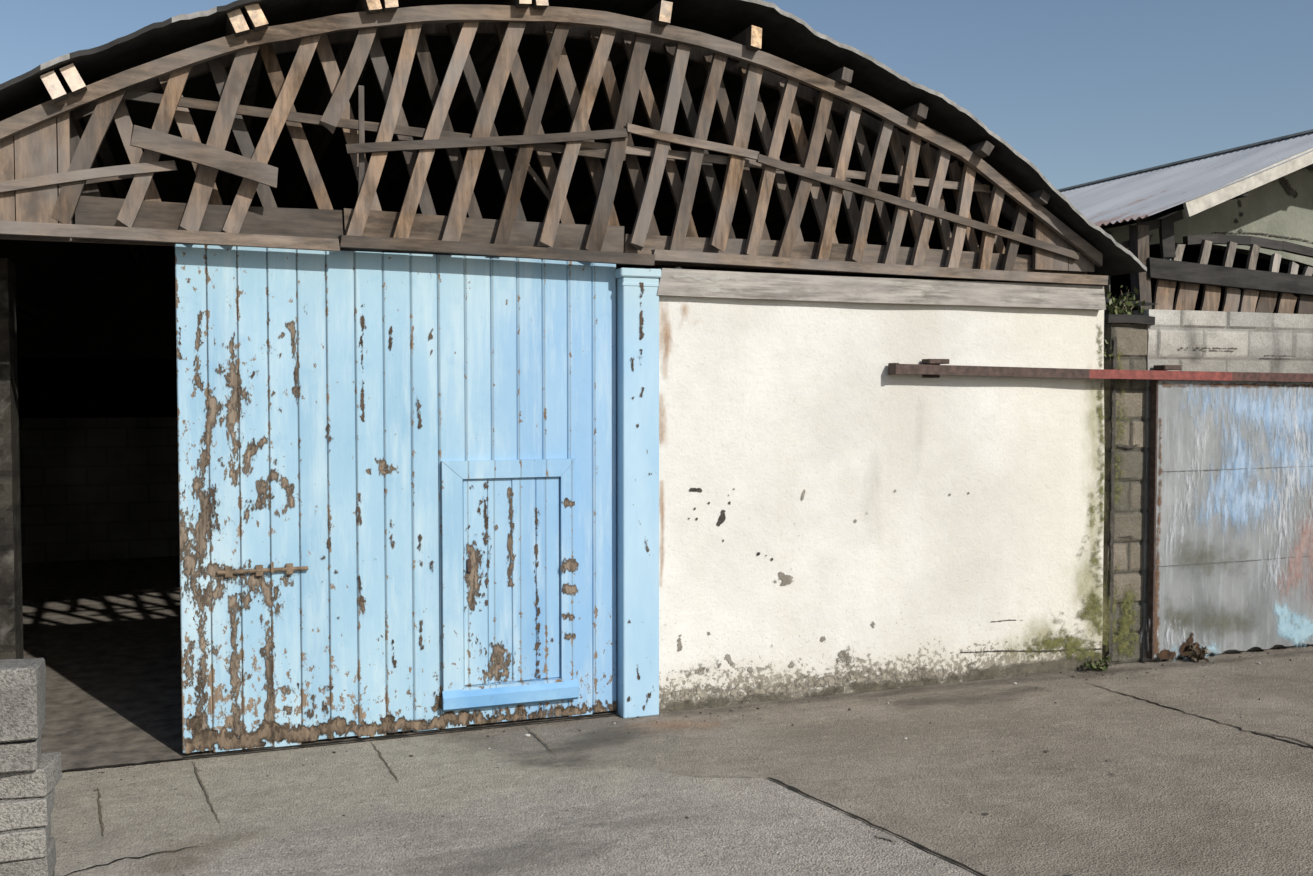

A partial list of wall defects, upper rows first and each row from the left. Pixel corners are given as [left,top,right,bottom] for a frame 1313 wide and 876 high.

peeling [177,311,333,737]
peeling [463,481,516,615]
peeling [465,633,516,685]
peeling [533,507,576,679]
peeling [560,558,579,596]
spalling [688,488,734,542]
spalling [757,552,793,586]
water stain [659,572,1119,713]
rust [1154,419,1162,654]
crack [64,846,203,876]